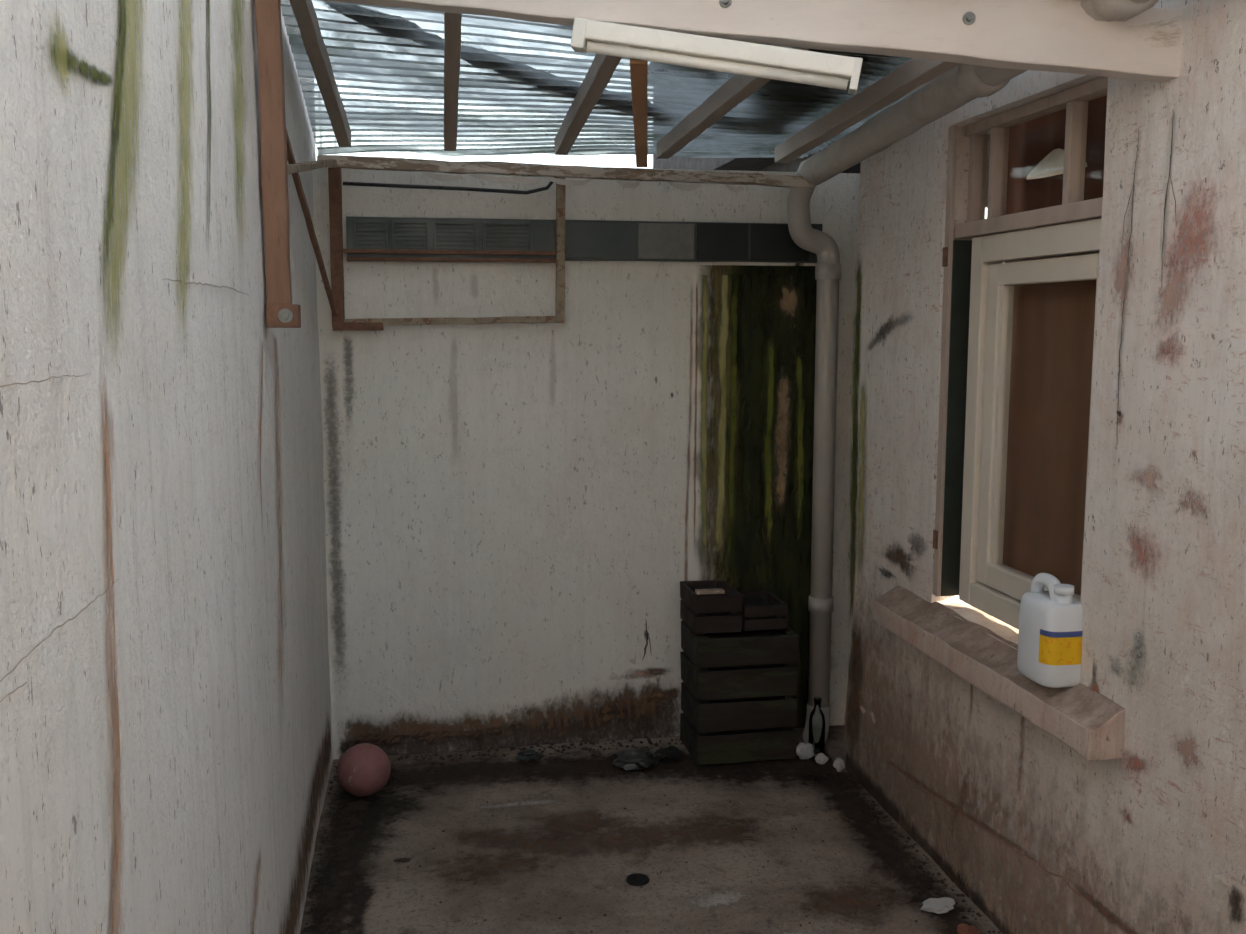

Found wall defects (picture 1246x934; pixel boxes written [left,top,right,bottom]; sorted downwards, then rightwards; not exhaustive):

crack [0,374,86,387]
damp [326,340,352,665]
damp [880,536,924,578]
crack [0,579,119,702]
damp [281,604,1118,934]